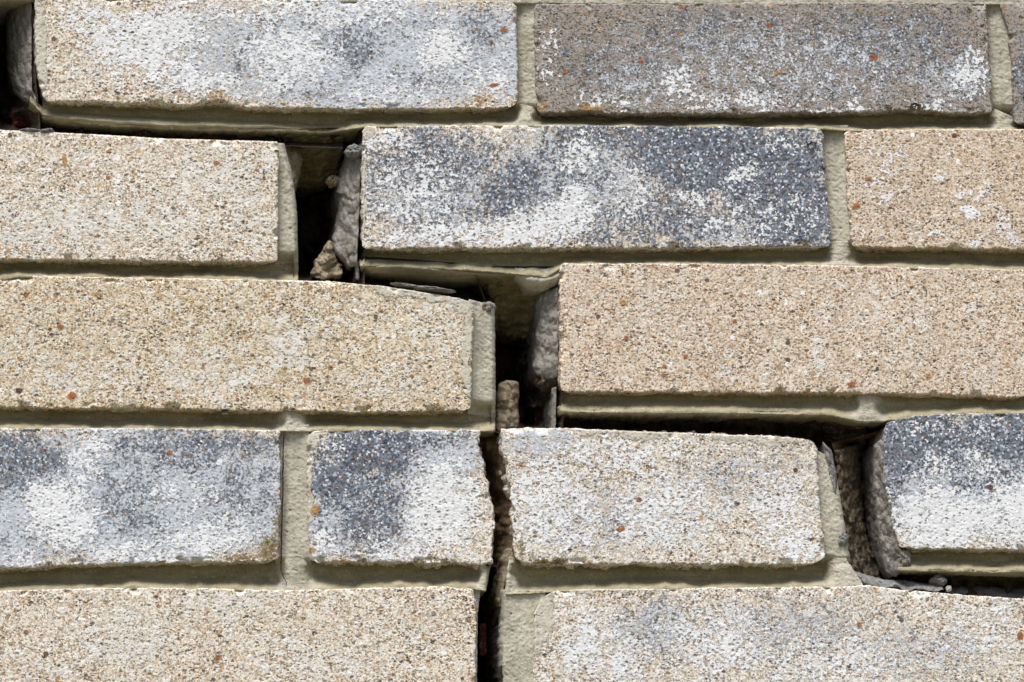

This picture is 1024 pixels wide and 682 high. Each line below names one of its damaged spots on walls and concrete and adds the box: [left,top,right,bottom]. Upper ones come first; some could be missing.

crack [0,1,553,303]
crack [477,338,881,682]
crack [887,574,1024,596]